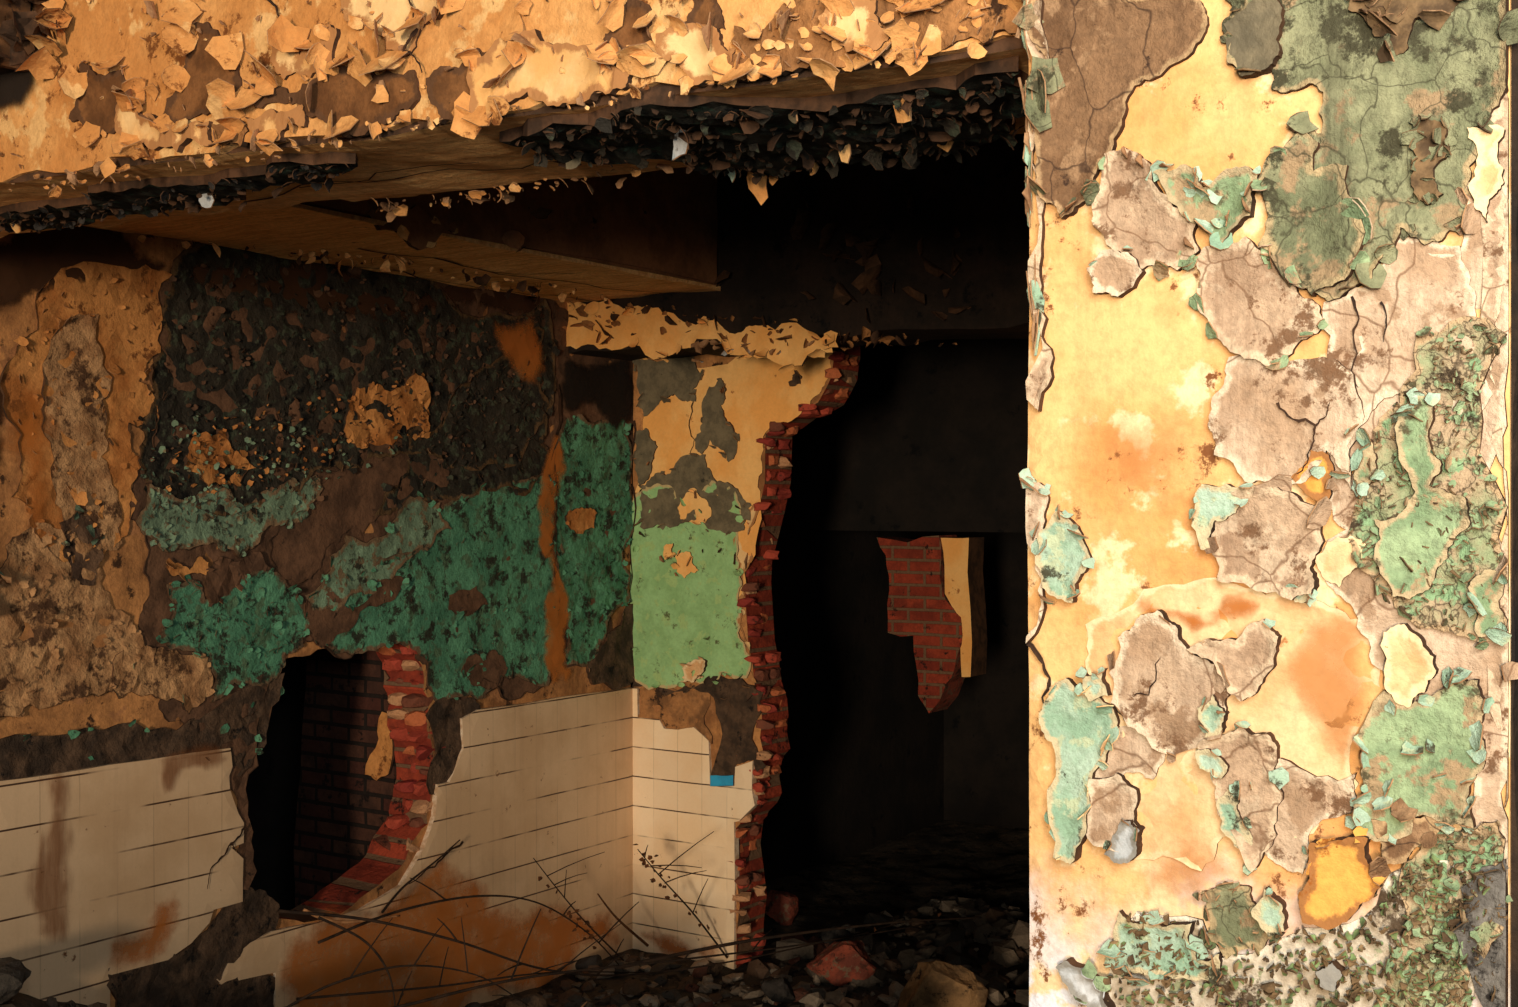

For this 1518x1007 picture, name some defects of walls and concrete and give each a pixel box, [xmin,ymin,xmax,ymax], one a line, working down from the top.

peeling [366,181,524,250]
peeling [0,240,919,1007]
corrosion [285,863,610,1007]